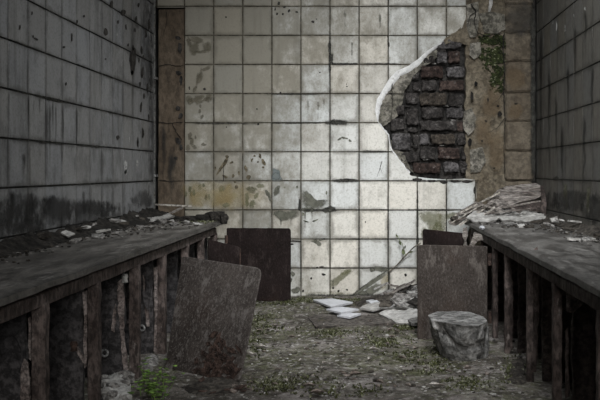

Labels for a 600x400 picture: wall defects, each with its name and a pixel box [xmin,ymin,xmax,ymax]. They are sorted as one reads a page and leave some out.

water stain [186,67,247,124]
spalling [375,0,506,204]
water stain [27,182,130,209]
water stain [265,169,282,201]
water stain [274,191,336,224]